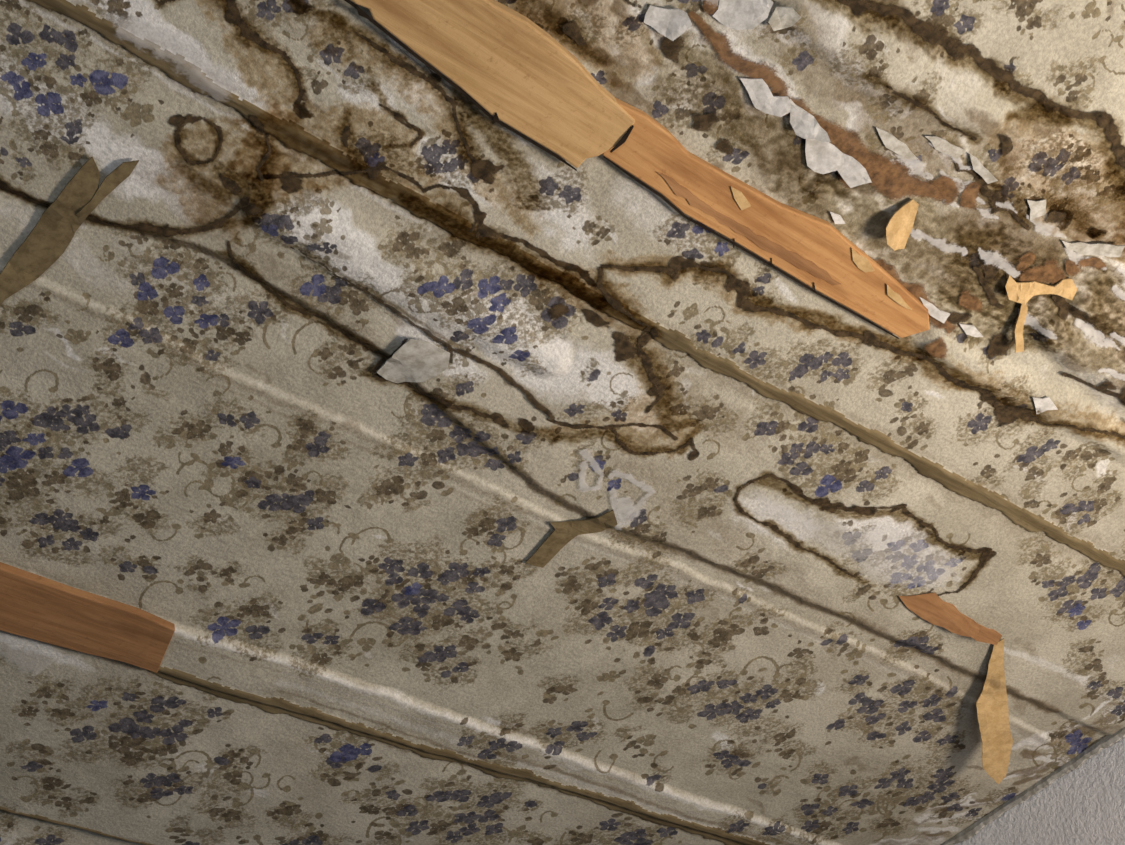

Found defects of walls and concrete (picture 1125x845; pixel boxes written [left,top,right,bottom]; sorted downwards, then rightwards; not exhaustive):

damp [217,0,315,119]
damp [287,0,540,210]
peeling [644,5,692,41]
damp [661,37,685,63]
peeling [712,0,801,31]
peeling [740,78,872,188]
damp [815,0,1125,199]
peeling [1027,199,1046,220]
peeling [377,339,450,383]
crack [290,247,555,420]
damp [86,111,1125,461]
peeling [920,297,983,337]